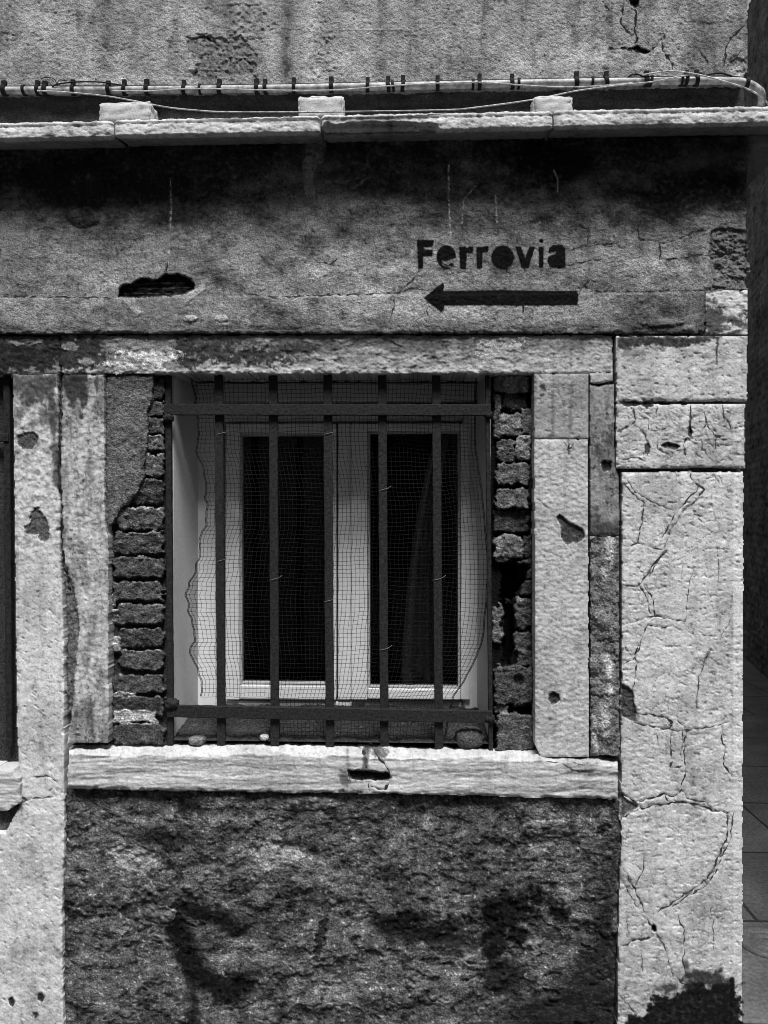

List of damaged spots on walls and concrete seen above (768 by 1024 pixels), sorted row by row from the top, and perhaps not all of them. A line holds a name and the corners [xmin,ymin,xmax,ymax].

crack [604,4,673,69]
crack [700,26,744,63]
spalling [118,273,206,319]
spalling [704,226,750,336]
flaking render [0,334,320,746]
flaking render [491,375,536,751]
spalling [557,515,585,545]
crack [618,404,737,985]
spalling [346,769,391,781]